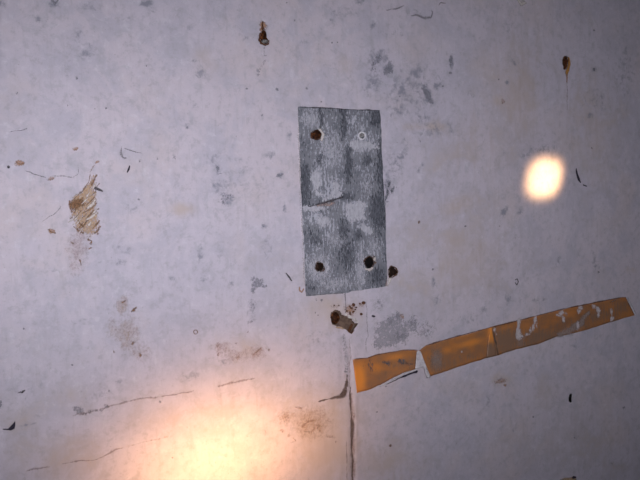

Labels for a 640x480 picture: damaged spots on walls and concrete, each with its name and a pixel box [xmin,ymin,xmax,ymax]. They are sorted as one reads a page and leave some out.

crack [318,338,355,480]